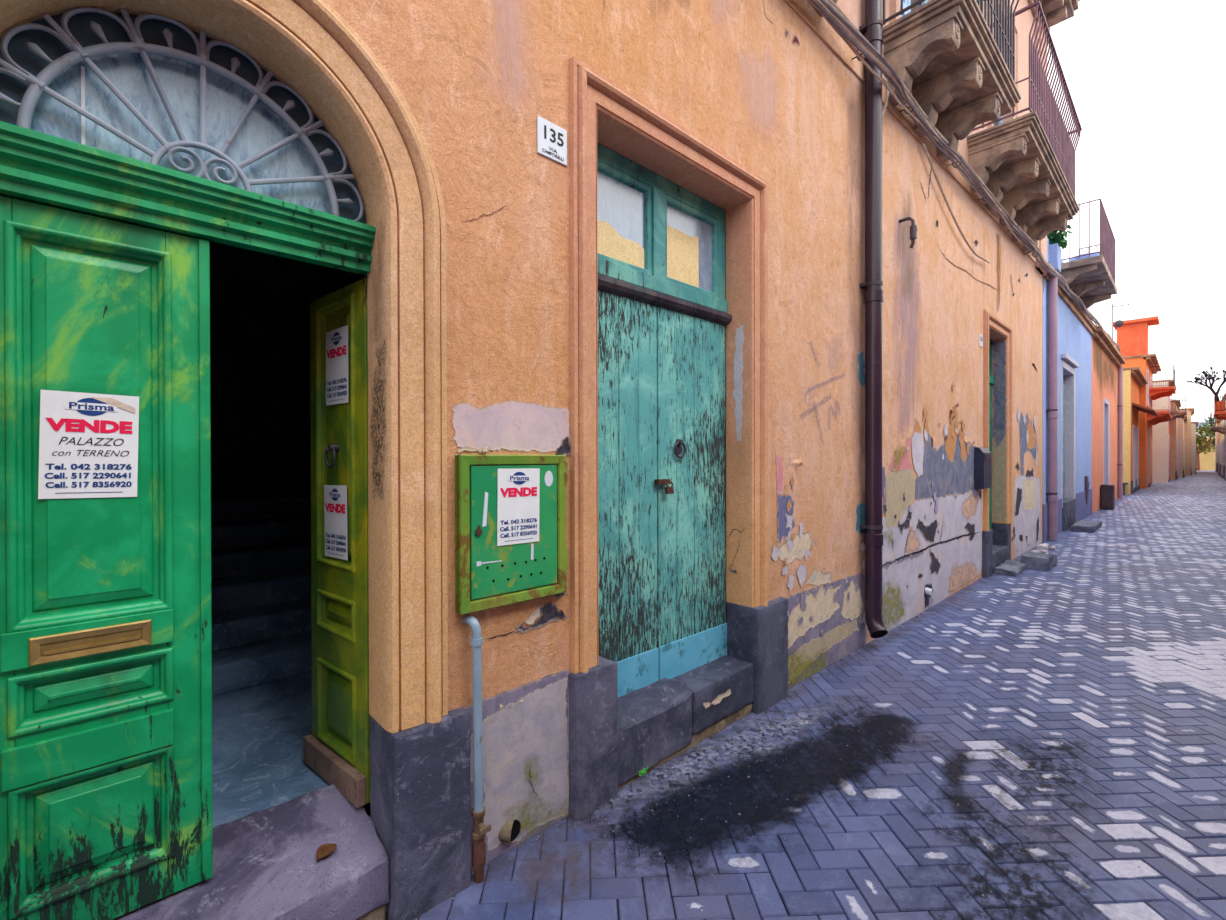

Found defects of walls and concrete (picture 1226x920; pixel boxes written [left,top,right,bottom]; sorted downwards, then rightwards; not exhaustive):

peeling [857,351,865,387]
flaking render [452,400,571,455]
flaking render [882,340,1041,632]
peeling [772,455,866,684]
flaking render [488,592,568,639]